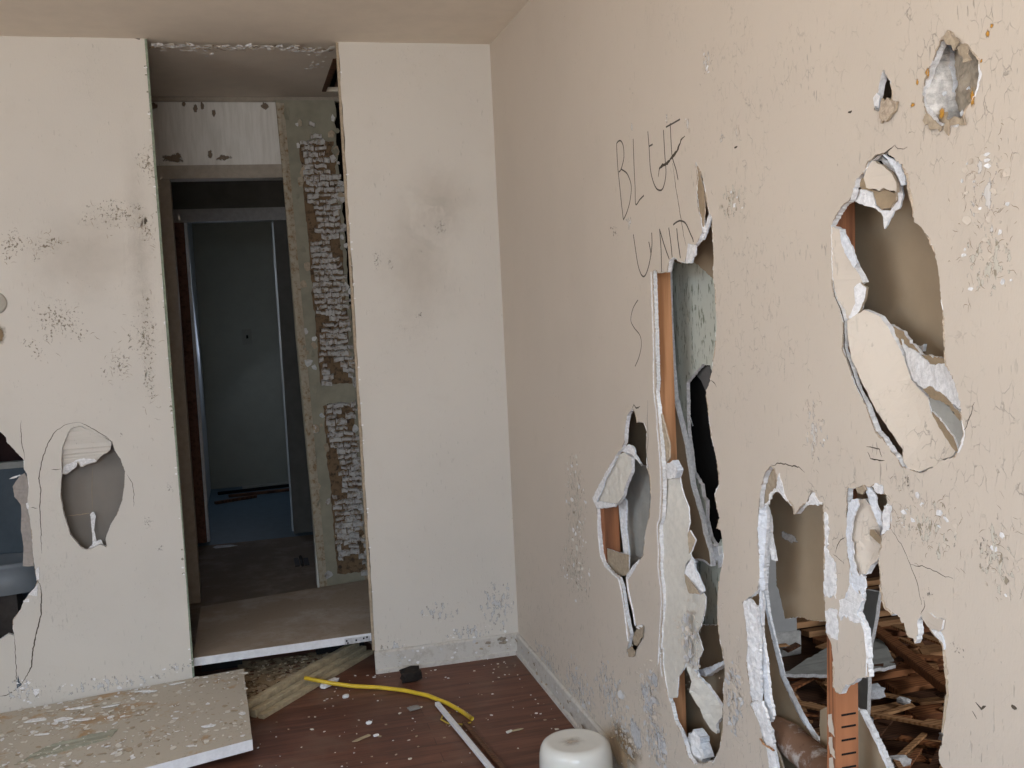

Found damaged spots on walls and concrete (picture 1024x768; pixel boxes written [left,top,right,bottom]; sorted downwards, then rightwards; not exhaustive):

spalling [873,75,898,123]
spalling [922,30,982,136]
peeling [328,114,353,250]
spalling [61,426,121,477]
spalling [592,152,1022,768]
spalling [5,455,39,636]
spalling [64,506,109,549]
crack [3,582,42,696]